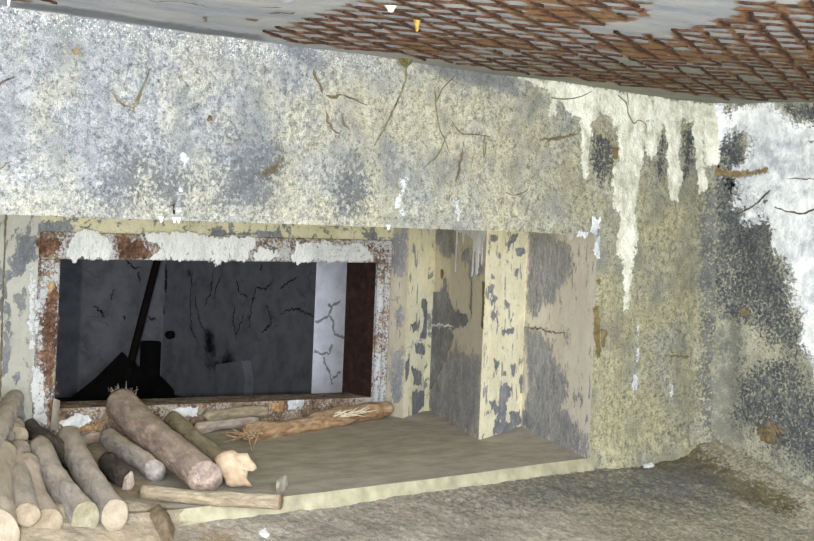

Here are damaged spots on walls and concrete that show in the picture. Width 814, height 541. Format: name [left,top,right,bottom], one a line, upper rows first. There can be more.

crack [313,69,350,134]
peeling [0,235,38,386]
corrosion [36,238,62,258]
corrosion [38,281,60,425]
crack [149,265,167,321]
crack [189,265,344,384]
crack [455,148,463,182]
peeling [388,228,588,459]
water stain [435,67,814,477]
crack [736,190,814,215]